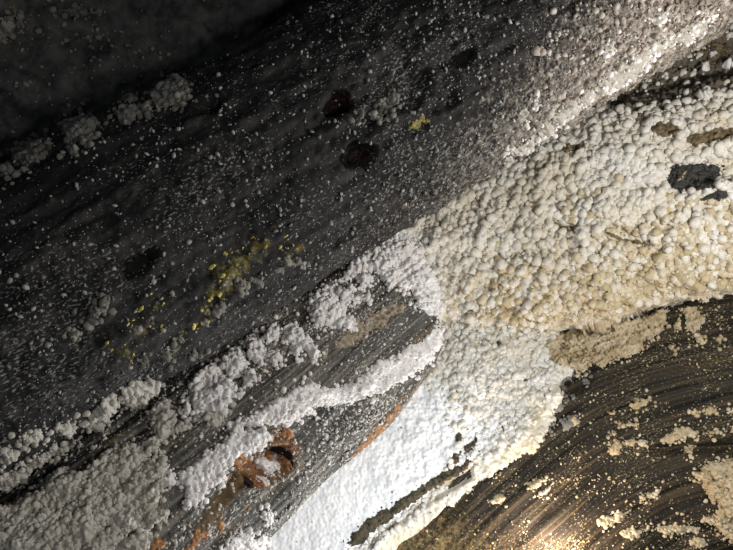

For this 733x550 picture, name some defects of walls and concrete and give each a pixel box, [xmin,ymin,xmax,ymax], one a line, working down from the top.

leakage [502,8,720,164]
leakage [722,58,733,73]
leakage [408,115,430,130]
spalling [660,163,729,201]
leakage [542,274,733,441]
leakage [0,229,445,550]
rust [226,427,299,489]
rust [350,397,401,459]
leakage [487,494,508,508]
leakage [524,473,554,503]
leakage [597,388,733,550]